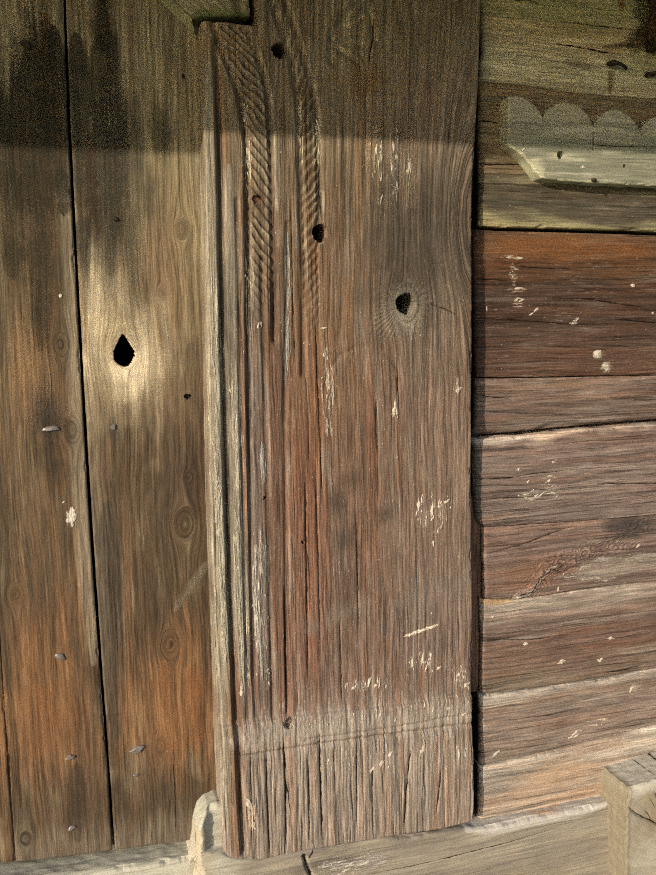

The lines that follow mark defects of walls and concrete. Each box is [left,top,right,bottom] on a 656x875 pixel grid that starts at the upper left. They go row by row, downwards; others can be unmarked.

damp [0,0,142,299]
crack [282,585,290,718]
crack [250,734,335,875]
crack [356,749,374,827]